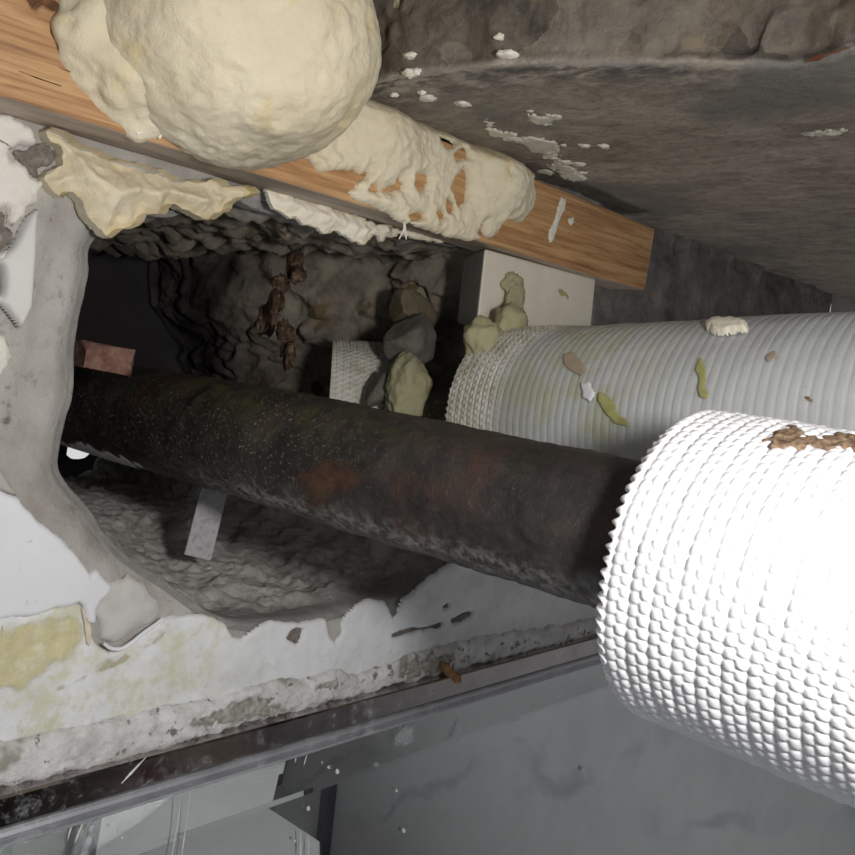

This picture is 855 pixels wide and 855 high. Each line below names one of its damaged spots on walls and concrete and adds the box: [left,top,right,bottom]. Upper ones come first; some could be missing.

flaking render [0,114,55,328]
flaking render [0,331,13,374]
damp [0,607,92,688]
flaking render [0,469,599,742]